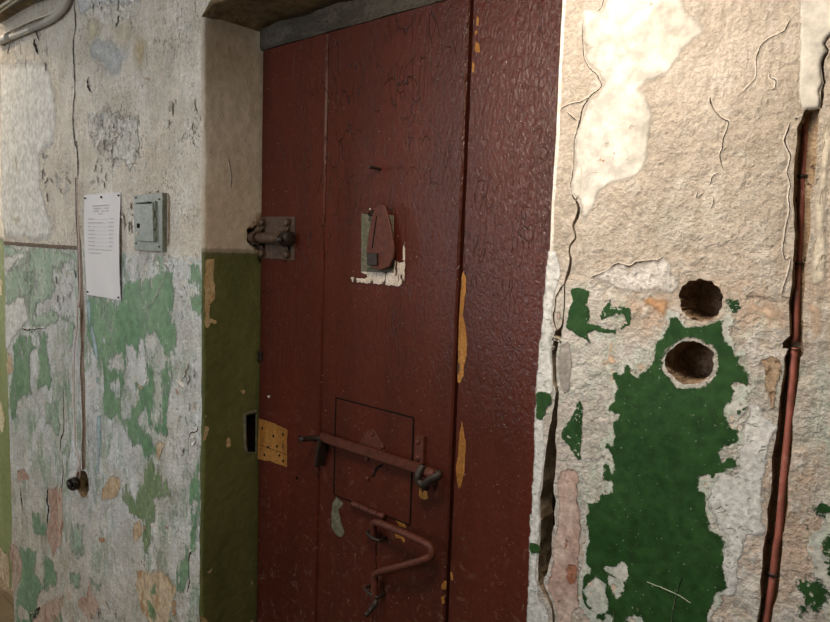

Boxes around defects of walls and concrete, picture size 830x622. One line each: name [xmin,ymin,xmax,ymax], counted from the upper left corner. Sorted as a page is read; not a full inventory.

crack [742,19,791,93]
peeling [0,244,77,436]
peeling [86,191,195,554]
peeling [536,391,551,420]
crack [538,0,605,622]
peeling [566,288,631,344]
crack [590,256,664,278]
peeling [547,317,750,622]
crack [695,97,731,209]
crack [781,123,793,296]
peeling [0,484,85,622]
peeling [795,533,830,620]